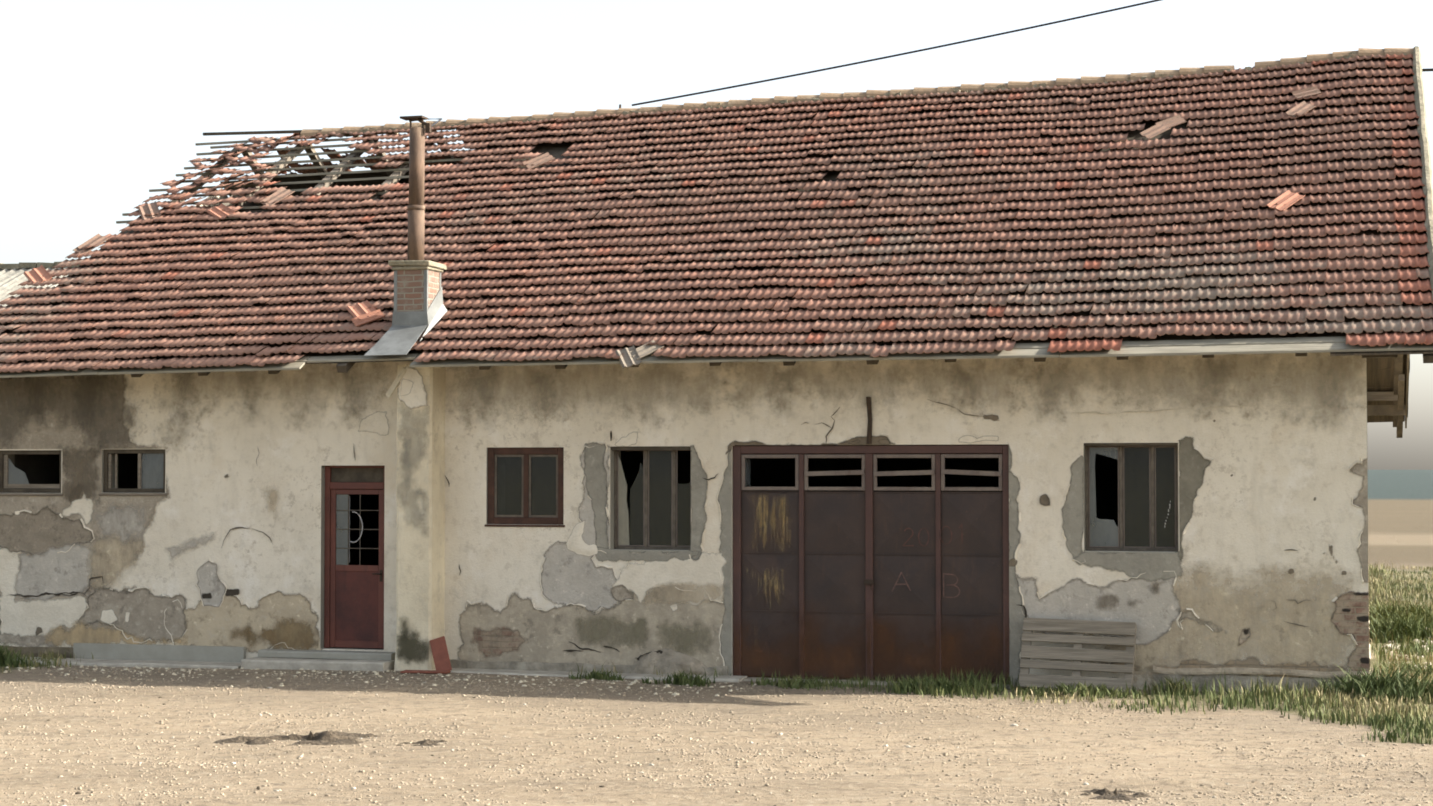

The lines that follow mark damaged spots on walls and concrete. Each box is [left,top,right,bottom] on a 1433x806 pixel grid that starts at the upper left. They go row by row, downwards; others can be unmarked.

flaking render [0,374,322,653]
flaking render [458,441,725,667]
flaking render [1039,484,1070,506]
flaking render [1009,544,1222,645]
flaking render [1112,459,1371,678]